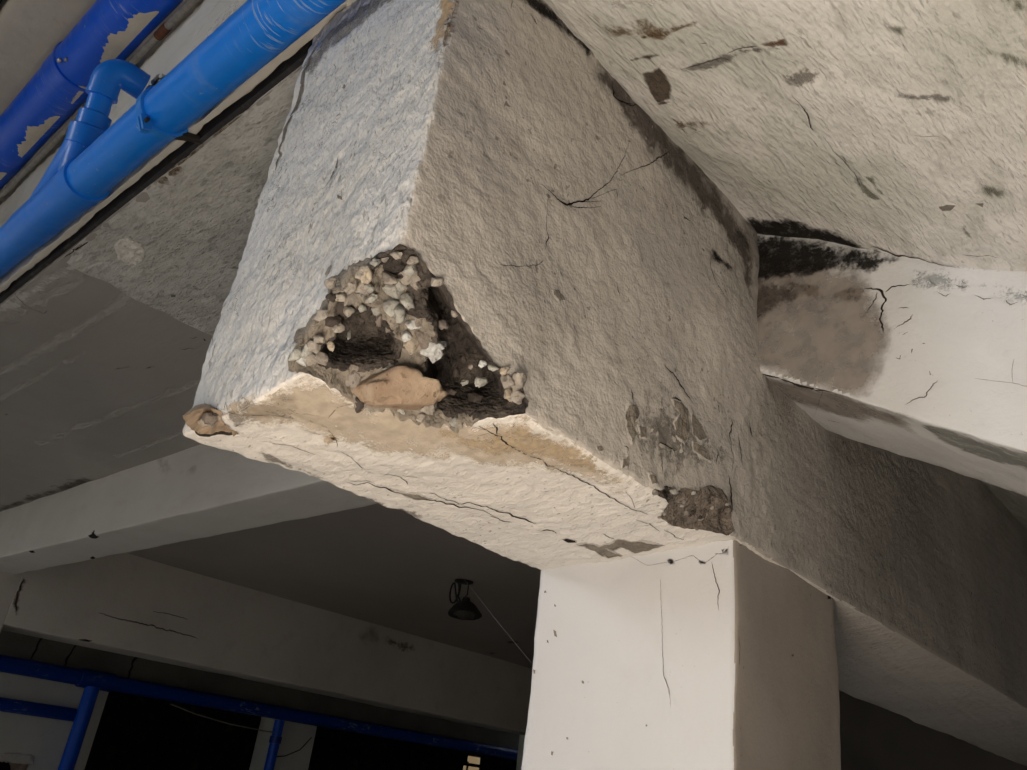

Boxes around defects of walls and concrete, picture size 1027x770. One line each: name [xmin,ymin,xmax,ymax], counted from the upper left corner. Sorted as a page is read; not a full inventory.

spalling [288,244,529,434]
spalling [183,403,238,437]
crack [224,402,556,533]
leakage [229,385,619,483]
peeling [620,390,647,470]
spalling [647,397,734,536]
peeling [562,534,665,558]
crack [101,611,197,639]